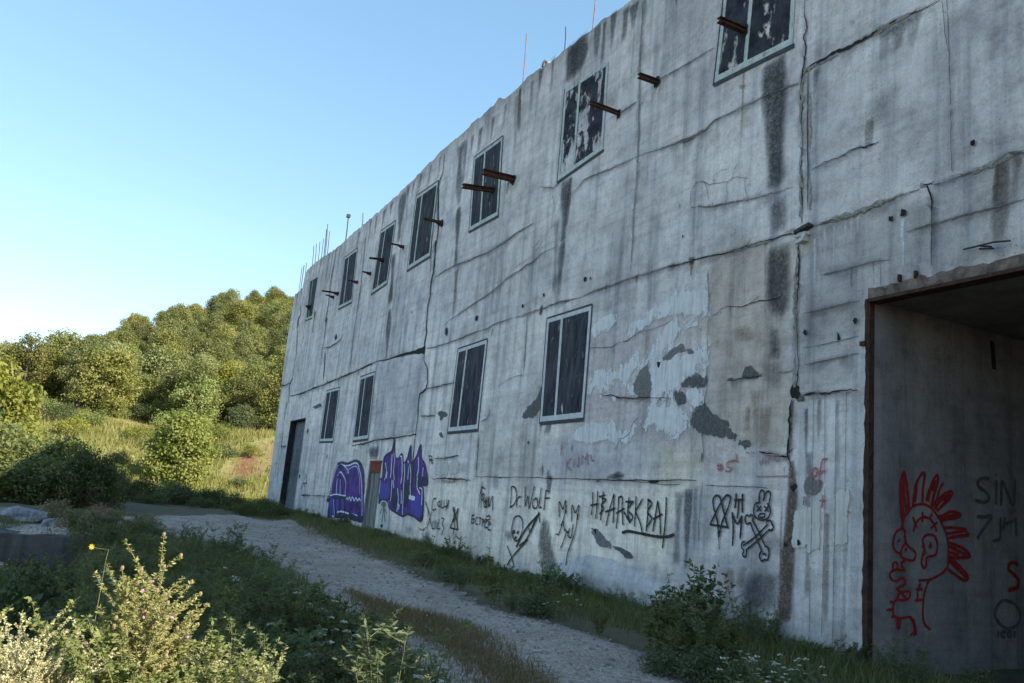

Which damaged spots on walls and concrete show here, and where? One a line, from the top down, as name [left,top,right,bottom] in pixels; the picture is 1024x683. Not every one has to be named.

damp [567,3,638,79]
damp [763,58,785,185]
damp [562,178,572,232]
damp [768,251,787,312]
crack [277,0,1024,645]
peeling [573,284,751,449]
spalling [727,365,759,380]